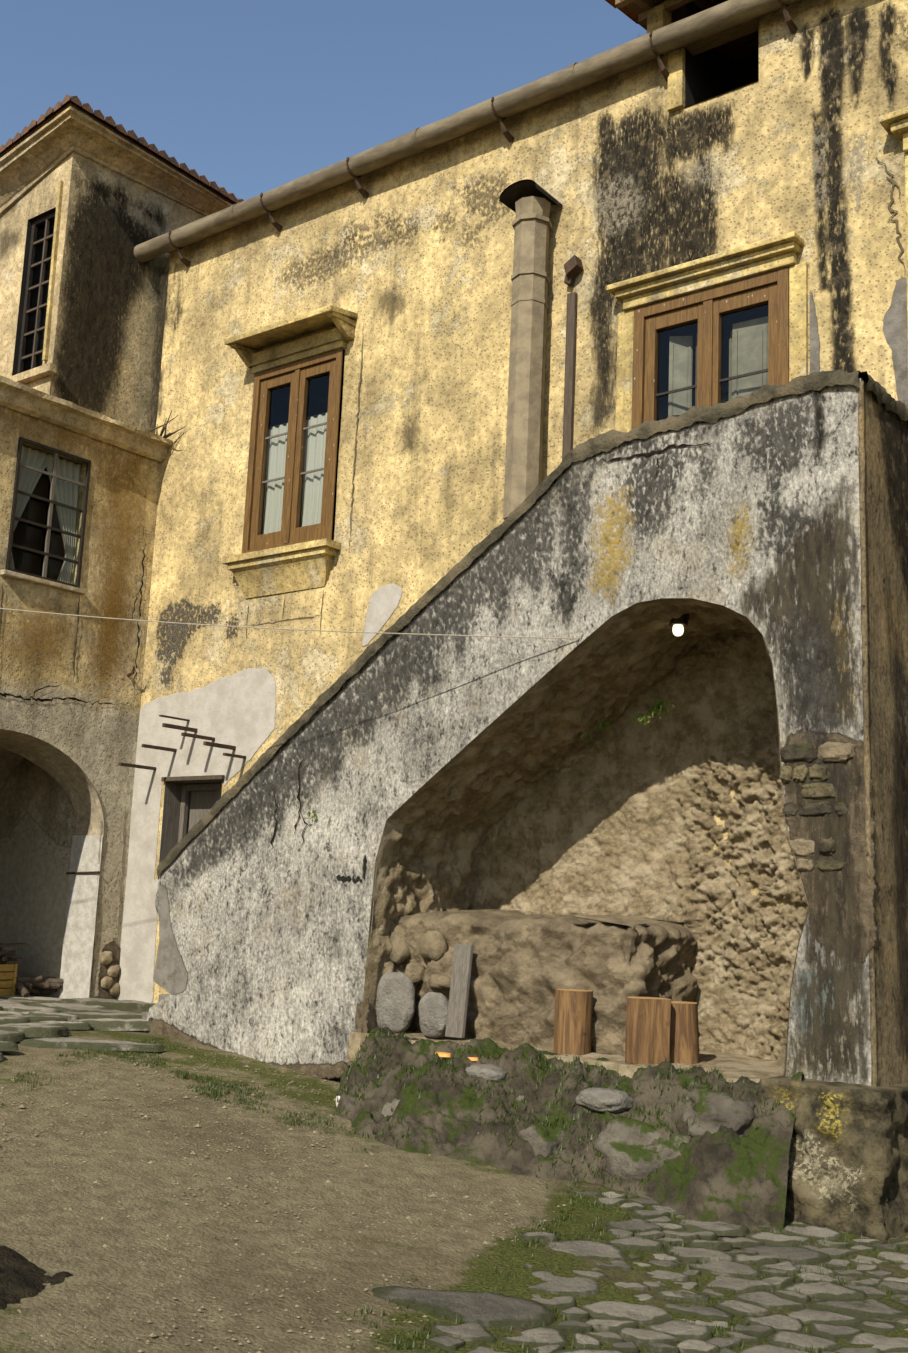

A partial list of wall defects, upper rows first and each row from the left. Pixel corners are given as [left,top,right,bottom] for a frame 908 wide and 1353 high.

crack [0,527,145,705]
damp [55,179,180,423]
damp [384,290,401,311]
damp [173,418,723,887]
crack [589,442,713,477]
damp [591,105,733,428]
damp [733,391,868,1082]
damp [800,3,898,373]
crack [868,151,905,268]
damp [879,410,908,1052]